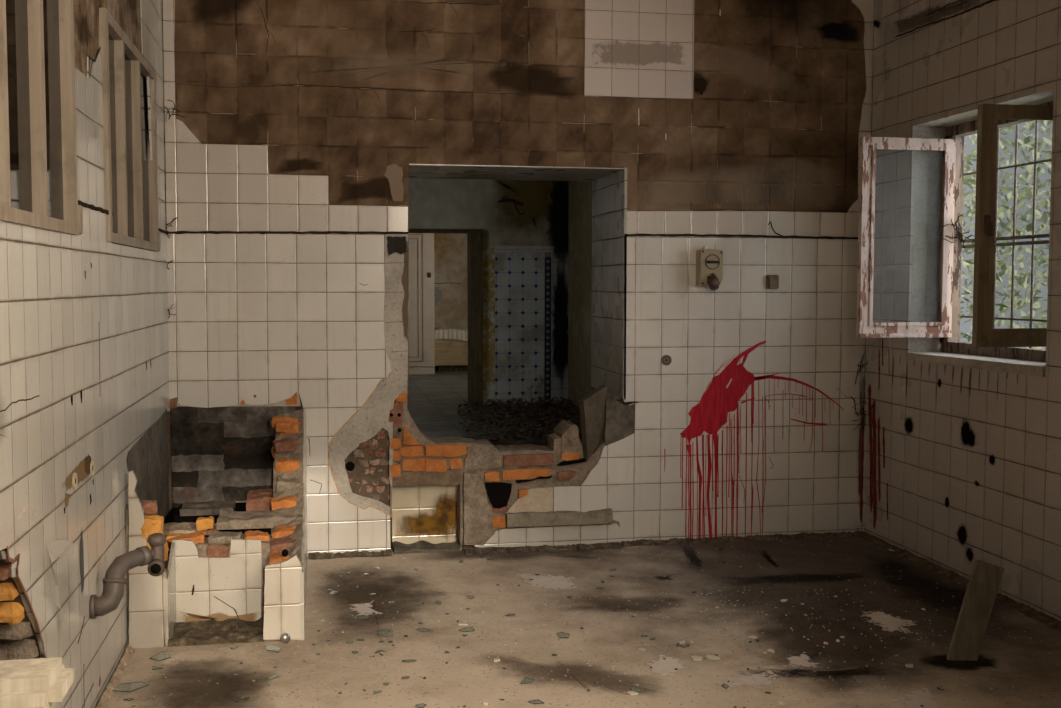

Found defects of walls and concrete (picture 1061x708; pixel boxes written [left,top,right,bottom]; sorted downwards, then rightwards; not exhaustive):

peeling [73,0,142,76]
peeling [175,0,866,213]
leakage [499,180,569,381]
spalling [232,392,300,406]
spalling [603,393,639,445]
spalling [0,546,46,660]